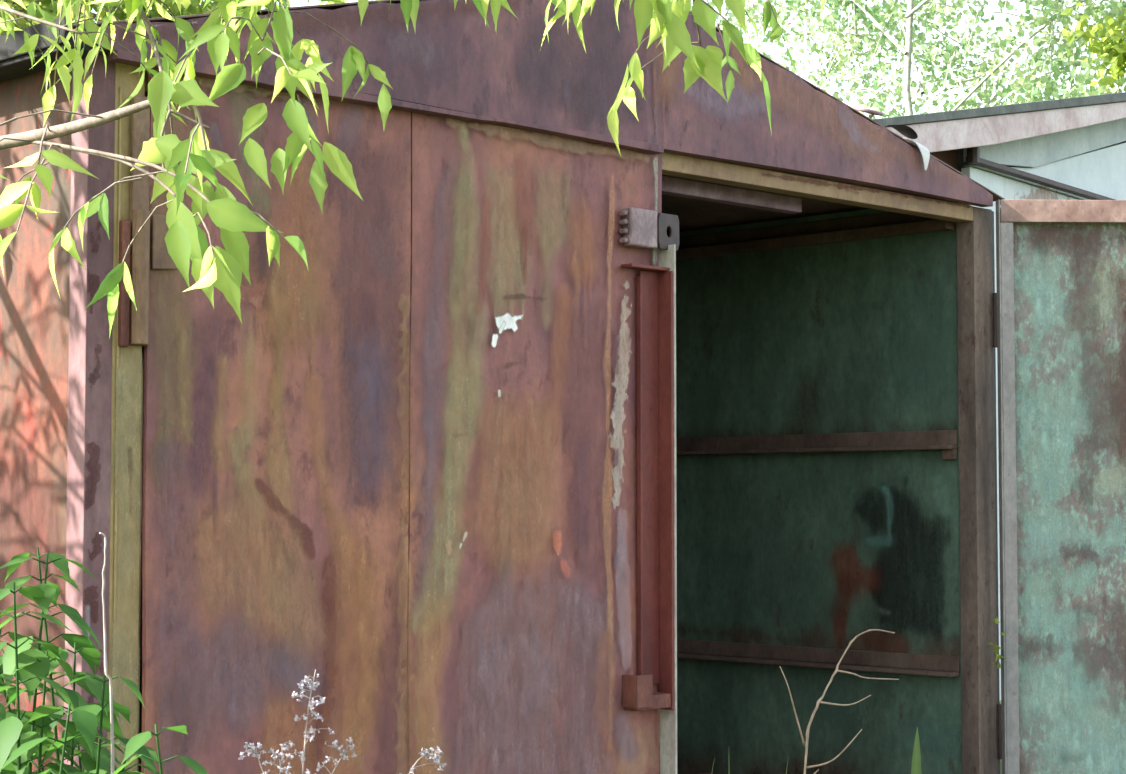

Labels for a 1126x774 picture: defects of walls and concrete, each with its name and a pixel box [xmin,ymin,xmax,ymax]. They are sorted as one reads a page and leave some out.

rust [235,83,291,99]
rust [475,124,648,161]
peeling [492,313,523,347]
rust [604,176,614,417]
rust [256,479,341,774]
rust [554,531,571,576]
rust [598,451,614,750]
peeling [609,281,630,664]